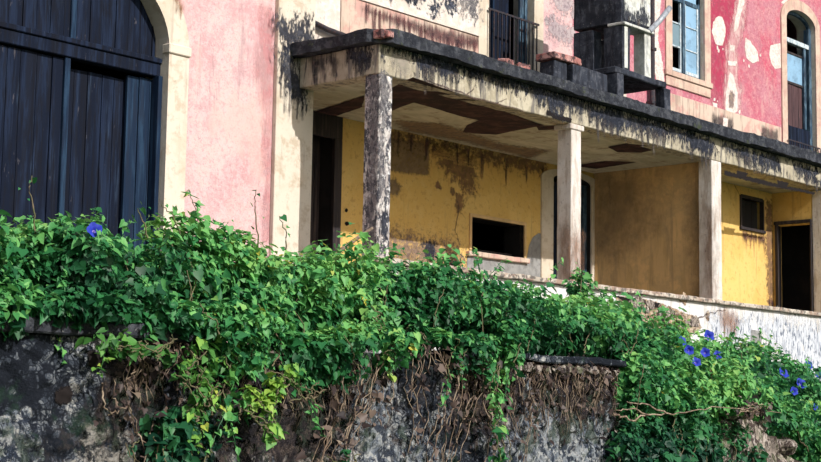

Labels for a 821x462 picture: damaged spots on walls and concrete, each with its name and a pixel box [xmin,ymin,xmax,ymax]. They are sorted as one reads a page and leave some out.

water stain [272,8,319,115]
water stain [310,52,335,80]
water stain [365,0,484,52]
water stain [620,0,651,30]
water stain [710,0,737,129]
peeling [712,0,781,115]
peeling [377,69,479,213]
spalling [537,110,572,130]
water stain [346,45,821,266]
peeling [381,210,389,239]
peeling [616,292,821,379]